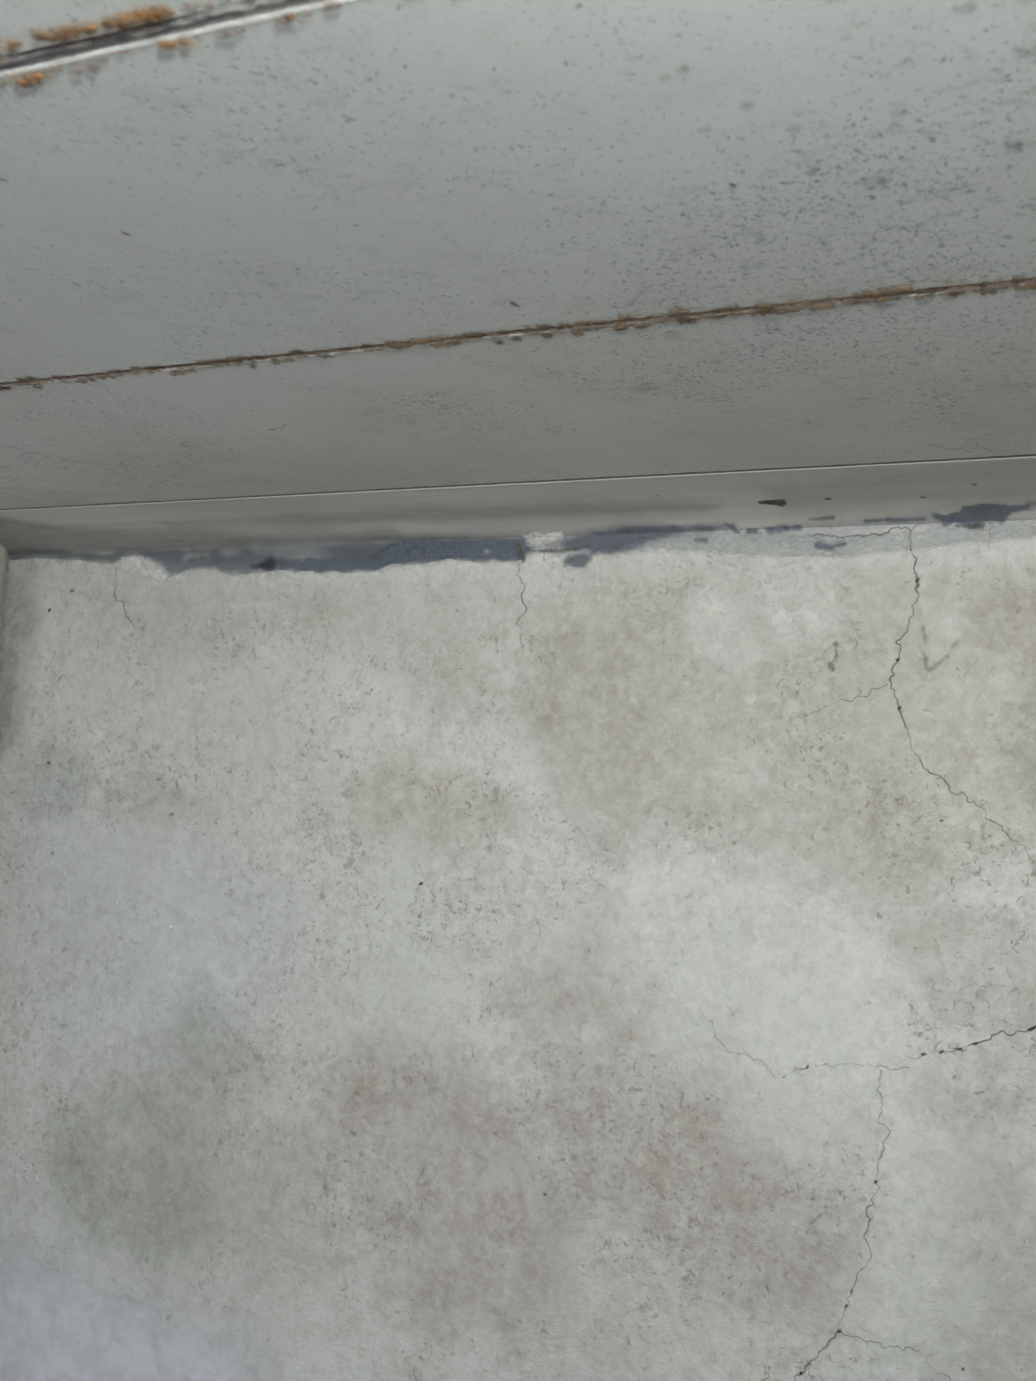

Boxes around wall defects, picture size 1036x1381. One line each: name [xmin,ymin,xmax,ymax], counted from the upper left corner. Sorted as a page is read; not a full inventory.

rust [0,5,212,61]
rust [0,73,45,88]
rust [0,276,1036,391]
peeling [260,566,389,582]
peeling [417,559,485,570]
peeling [815,536,846,550]
crack [818,524,989,820]
crack [704,1020,1036,1381]